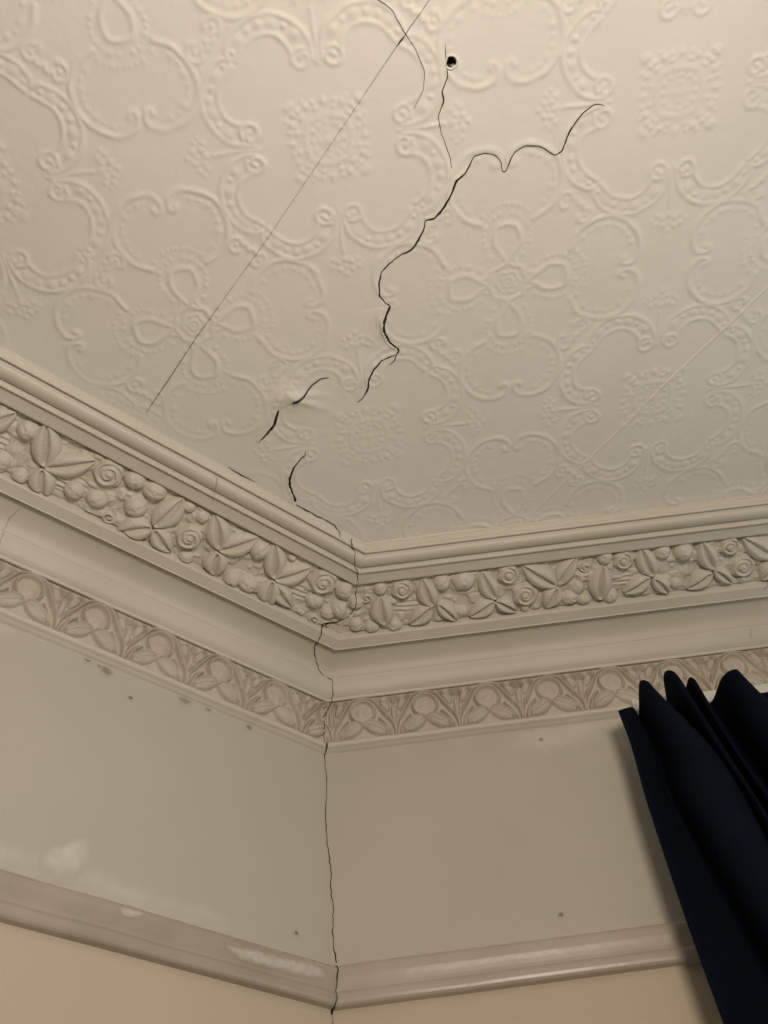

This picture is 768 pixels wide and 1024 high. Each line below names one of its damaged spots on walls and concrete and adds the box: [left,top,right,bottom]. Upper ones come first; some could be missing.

crack [358,0,601,402]
crack [256,378,326,442]
crack [286,451,359,1024]